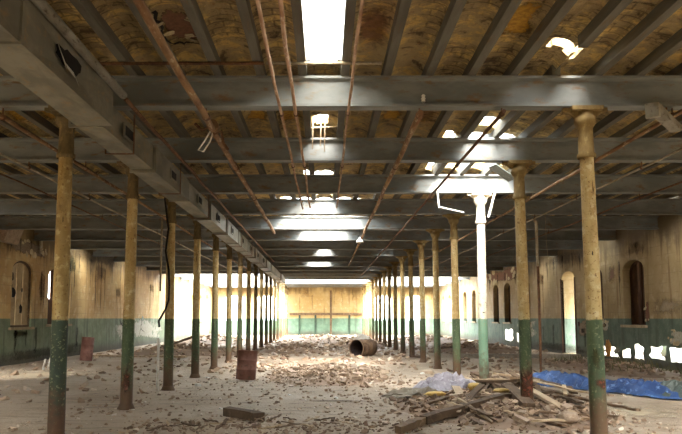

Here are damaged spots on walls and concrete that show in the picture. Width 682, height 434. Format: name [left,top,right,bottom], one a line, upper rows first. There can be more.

spalling [151,9,199,45]
flaking render [486,267,517,287]
peeling [134,316,163,339]
rust [521,367,533,397]